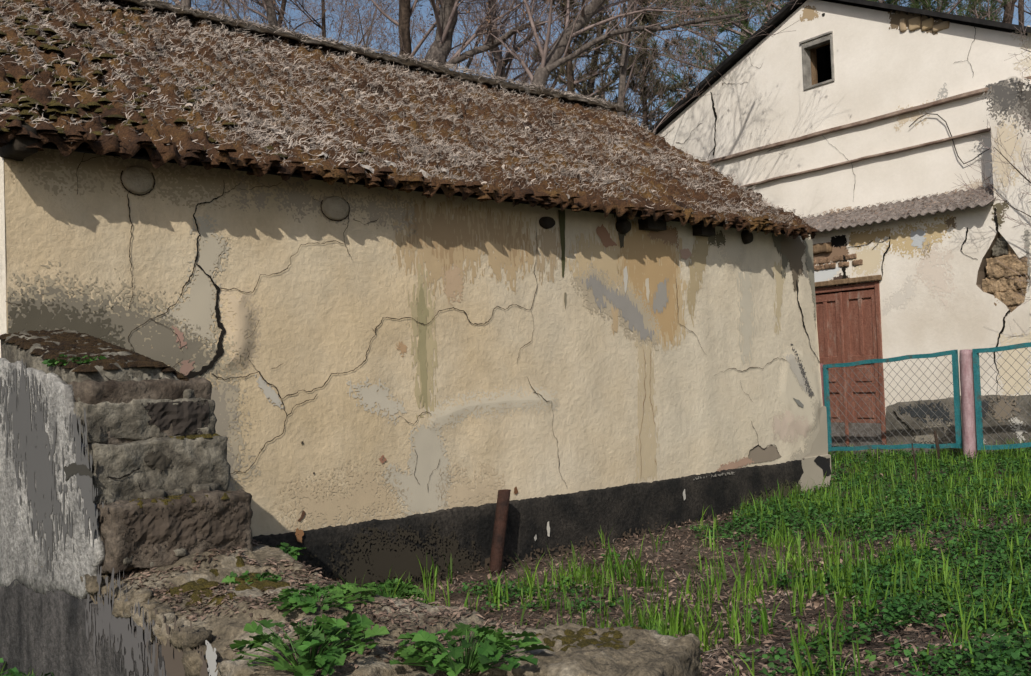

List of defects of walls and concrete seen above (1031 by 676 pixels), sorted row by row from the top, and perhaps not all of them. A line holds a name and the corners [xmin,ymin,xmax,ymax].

spalling [888,11,950,35]
crack [665,54,762,166]
damp [939,26,1031,195]
damp [5,148,565,418]
crack [76,153,567,486]
damp [687,224,726,327]
crack [796,280,823,369]
spalling [780,228,892,329]
crack [993,310,1010,386]
spalling [976,200,1031,312]
damp [0,260,261,581]
spalling [683,343,831,500]